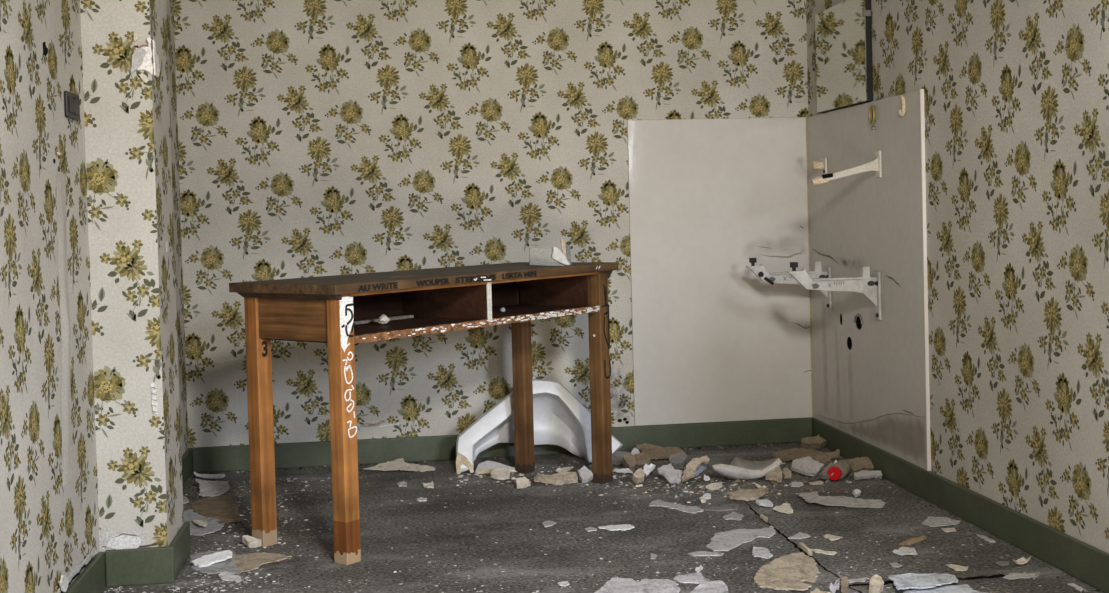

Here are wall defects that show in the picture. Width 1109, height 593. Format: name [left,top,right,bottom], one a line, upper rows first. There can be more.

peeling [131,33,160,83]
crack [744,501,894,593]
crack [957,573,1005,581]